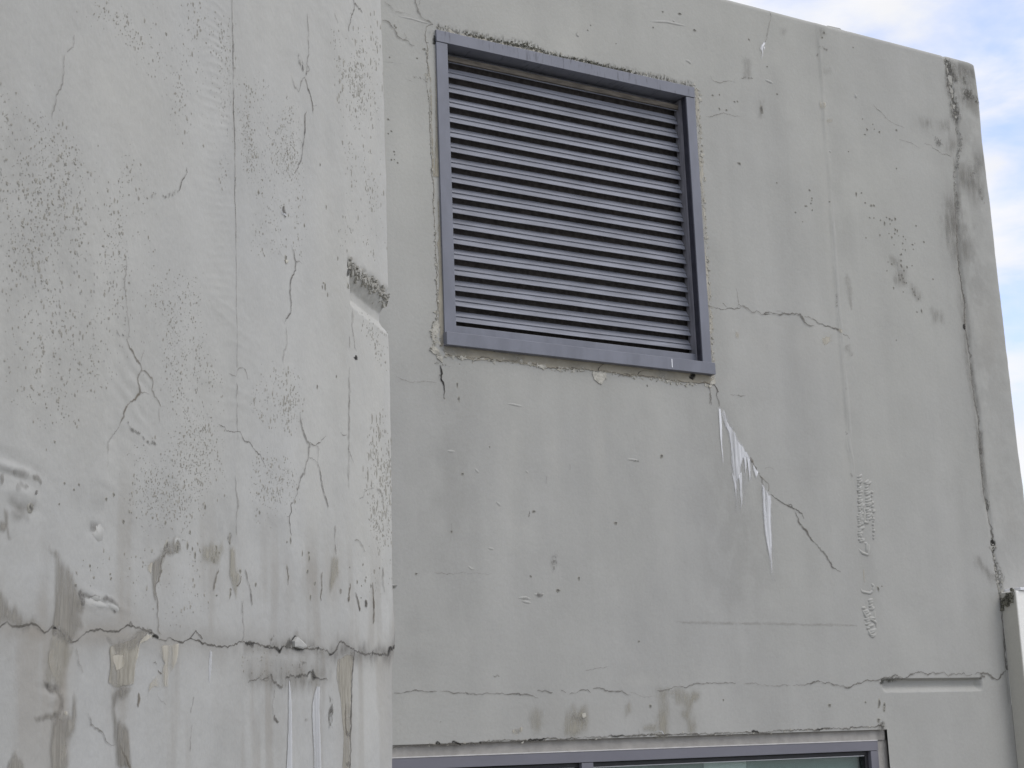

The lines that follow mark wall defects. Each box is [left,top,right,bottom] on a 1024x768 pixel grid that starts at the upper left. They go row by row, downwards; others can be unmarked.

spalling [330,11,399,371]
spalling [416,25,738,404]
crack [122,334,160,444]
spalling [105,263,232,627]
leakage [719,409,772,557]
crack [771,494,838,571]
crack [962,404,1008,680]
leakage [39,686,75,768]
leakage [53,565,83,673]
leakage [115,719,130,767]
leakage [109,631,151,706]
crack [0,573,394,766]